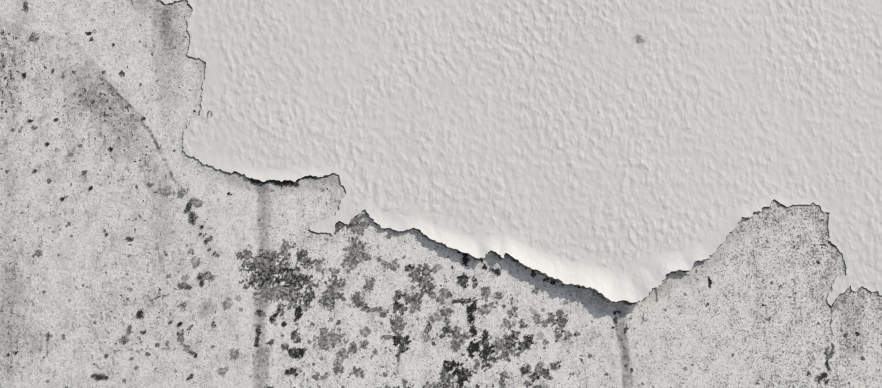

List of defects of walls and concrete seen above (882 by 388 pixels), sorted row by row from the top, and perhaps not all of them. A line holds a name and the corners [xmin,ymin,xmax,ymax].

damp [236,213,581,388]